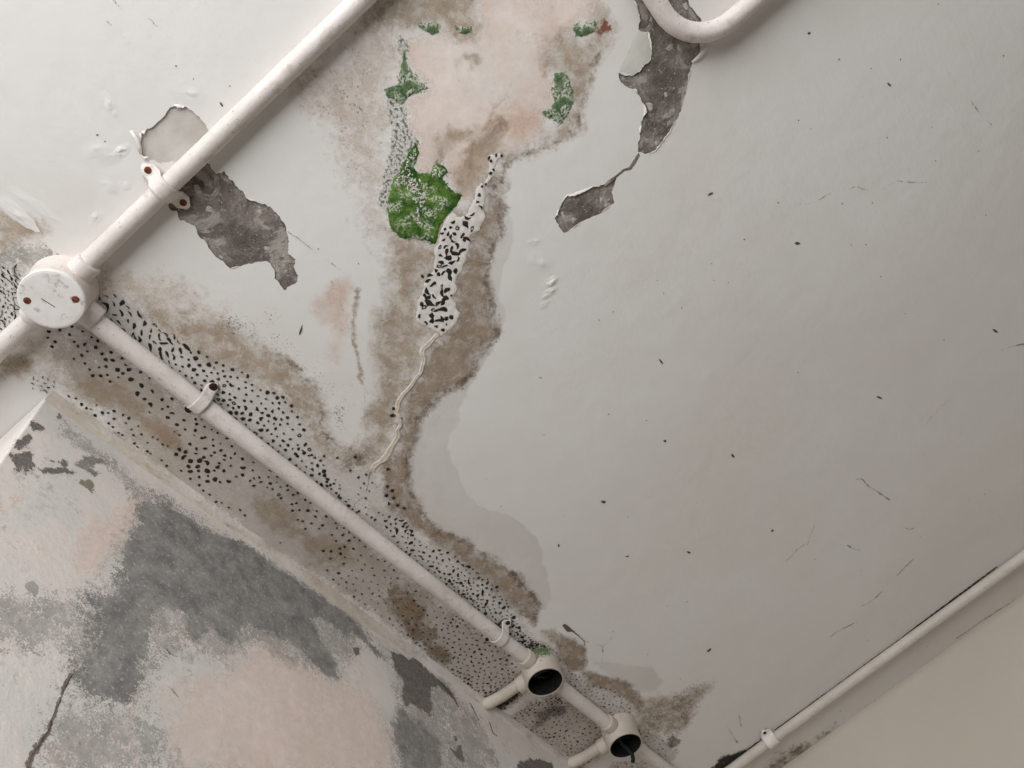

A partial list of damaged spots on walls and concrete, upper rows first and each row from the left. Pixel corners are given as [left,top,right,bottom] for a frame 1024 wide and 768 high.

leakage [378,0,474,36]
spalling [130,104,208,164]
leakage [379,99,417,213]
spalling [555,0,709,233]
spalling [167,162,298,290]
peeling [9,420,106,493]
leakage [0,119,704,768]
crack [25,673,73,768]